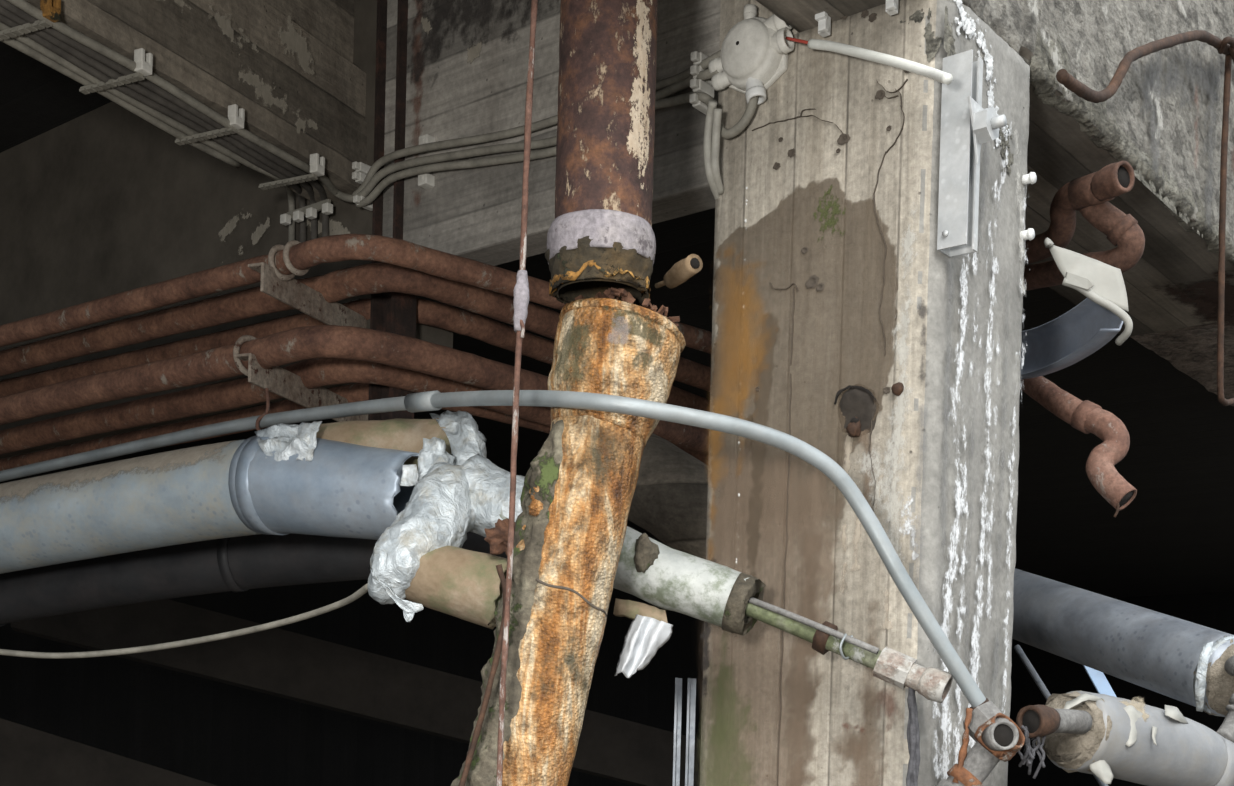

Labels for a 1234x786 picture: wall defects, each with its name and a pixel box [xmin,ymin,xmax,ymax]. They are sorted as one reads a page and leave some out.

leakage [408,0,551,112]
leakage [953,0,1026,222]
spalling [1030,28,1234,264]
leakage [710,430,861,624]
leakage [710,178,927,585]
leakage [941,223,1016,713]
corrosion [1155,272,1234,326]
leakage [701,621,817,786]
leakage [856,690,882,786]
efflorescence [932,684,976,779]